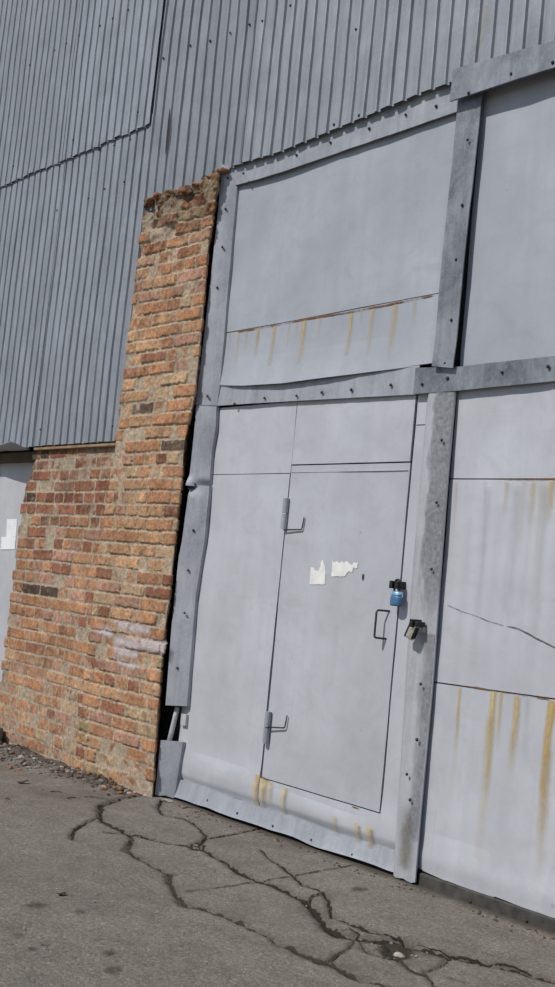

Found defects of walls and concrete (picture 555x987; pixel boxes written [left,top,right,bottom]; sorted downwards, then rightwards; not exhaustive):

rust [291,295,432,338]
crack [448,605,555,648]
rust [473,687,554,760]